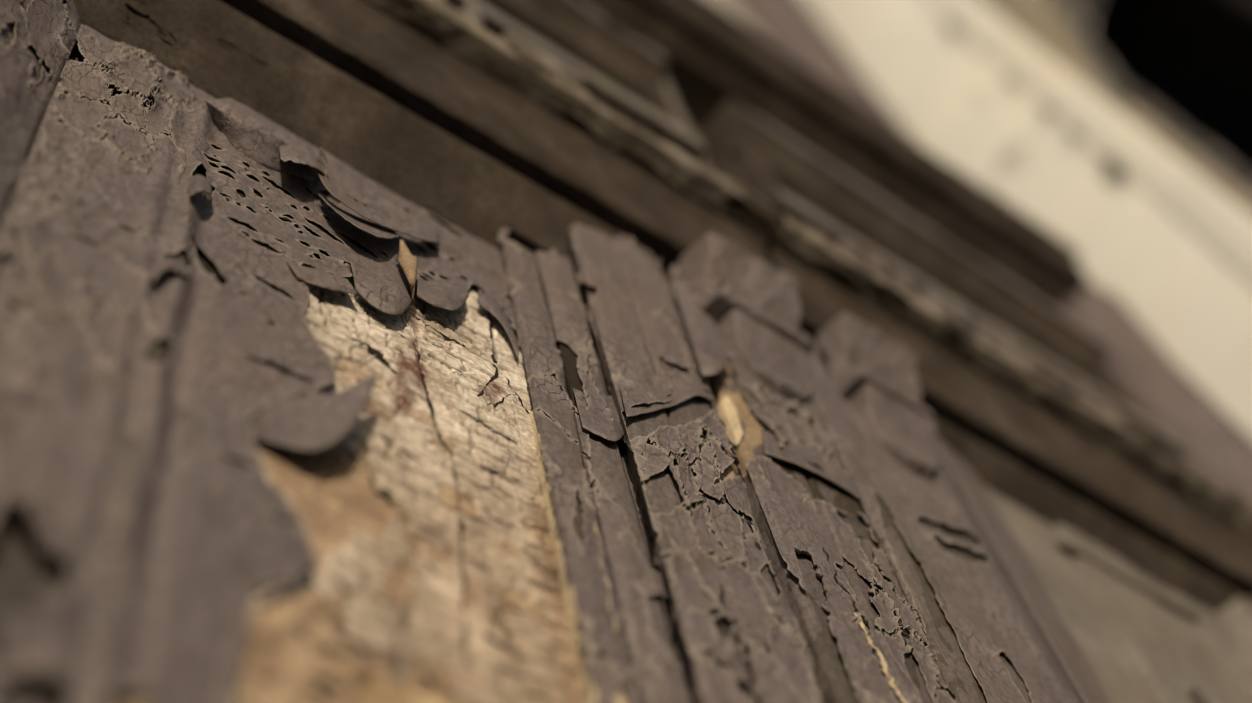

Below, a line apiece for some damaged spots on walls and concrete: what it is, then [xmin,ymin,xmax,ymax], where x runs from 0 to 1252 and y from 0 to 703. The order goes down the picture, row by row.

peeling [148,250,190,283]
peeling [188,168,220,200]
crack [187,221,225,287]
crack [207,157,377,300]
crack [404,209,467,281]
peeling [141,338,171,364]
peeling [205,100,594,703]
crack [337,293,546,671]
peeling [556,277,987,703]
peeling [0,511,42,632]